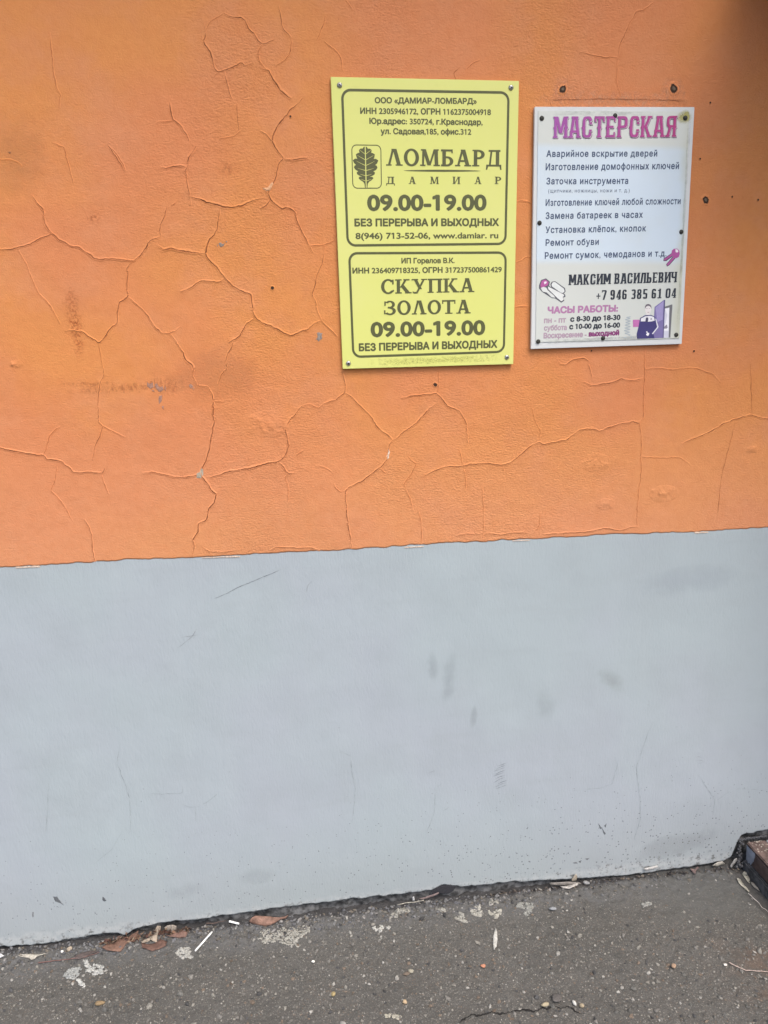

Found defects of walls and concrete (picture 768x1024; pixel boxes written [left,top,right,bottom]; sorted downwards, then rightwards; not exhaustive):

crack [0,0,768,562]